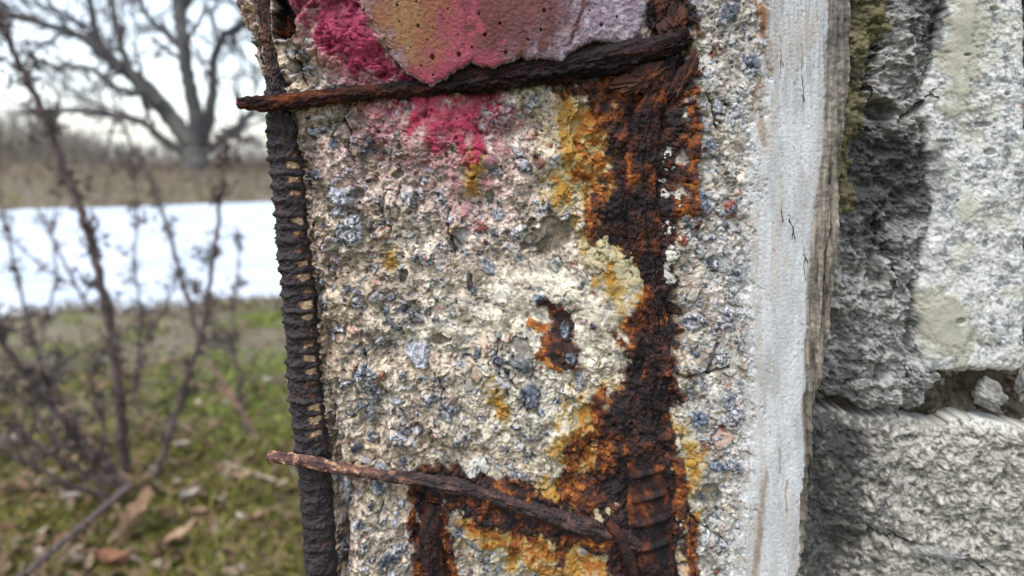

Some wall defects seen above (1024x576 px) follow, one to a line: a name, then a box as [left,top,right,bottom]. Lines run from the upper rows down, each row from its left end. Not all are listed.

corrosion [271,0,297,40]
spalling [236,0,403,93]
spalling [287,71,644,576]
corrosion [362,0,589,68]
corrosion [406,0,710,576]
spalling [664,0,767,576]